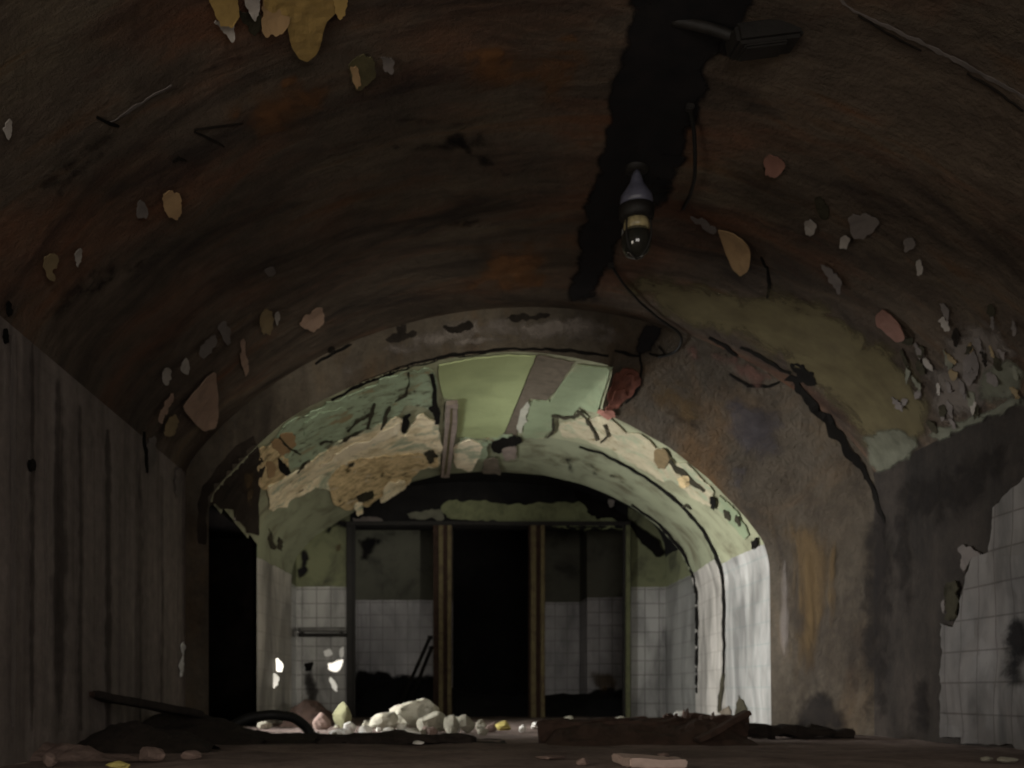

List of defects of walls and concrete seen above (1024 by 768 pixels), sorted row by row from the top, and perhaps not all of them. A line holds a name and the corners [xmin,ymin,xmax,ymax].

peeling [209,0,348,62]
peeling [142,321,249,473]
peeling [299,308,324,332]
crack [279,325,666,474]
peeling [197,355,758,551]
peeling [690,216,751,278]
crack [708,336,885,523]
peeling [627,277,1024,472]
crack [547,410,725,713]
water stain [863,448,1001,713]
peeling [941,545,982,621]
water stain [800,693,842,730]